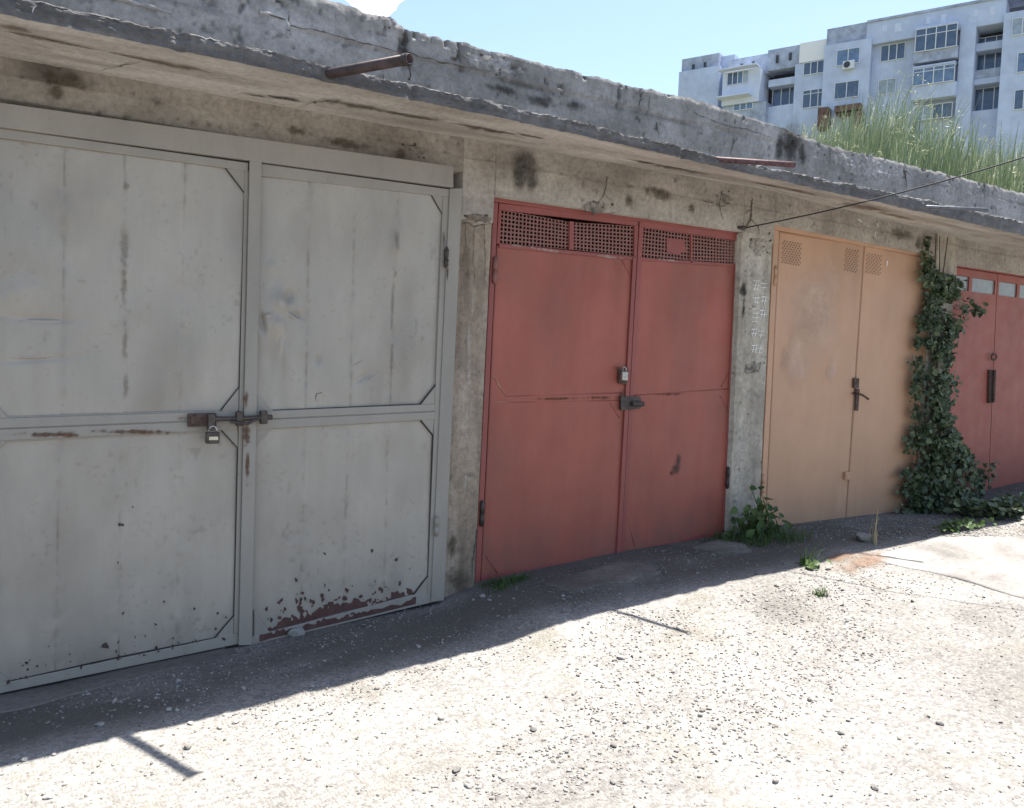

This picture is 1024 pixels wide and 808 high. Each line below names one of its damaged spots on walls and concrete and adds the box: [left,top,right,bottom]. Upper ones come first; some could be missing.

leakage [50,73,79,97]
leakage [777,130,805,161]
leakage [515,155,536,187]
peeling [260,578,416,642]